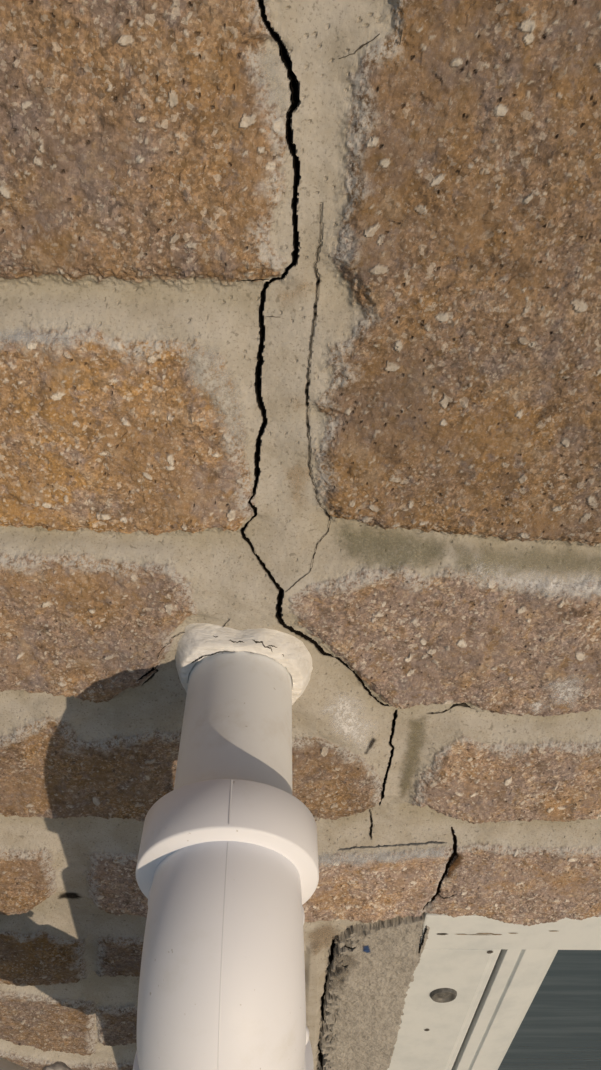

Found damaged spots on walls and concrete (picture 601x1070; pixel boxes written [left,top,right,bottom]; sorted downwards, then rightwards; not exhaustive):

crack [192,0,456,954]
crack [139,632,185,685]
crack [430,703,472,714]
crack [317,938,355,1070]